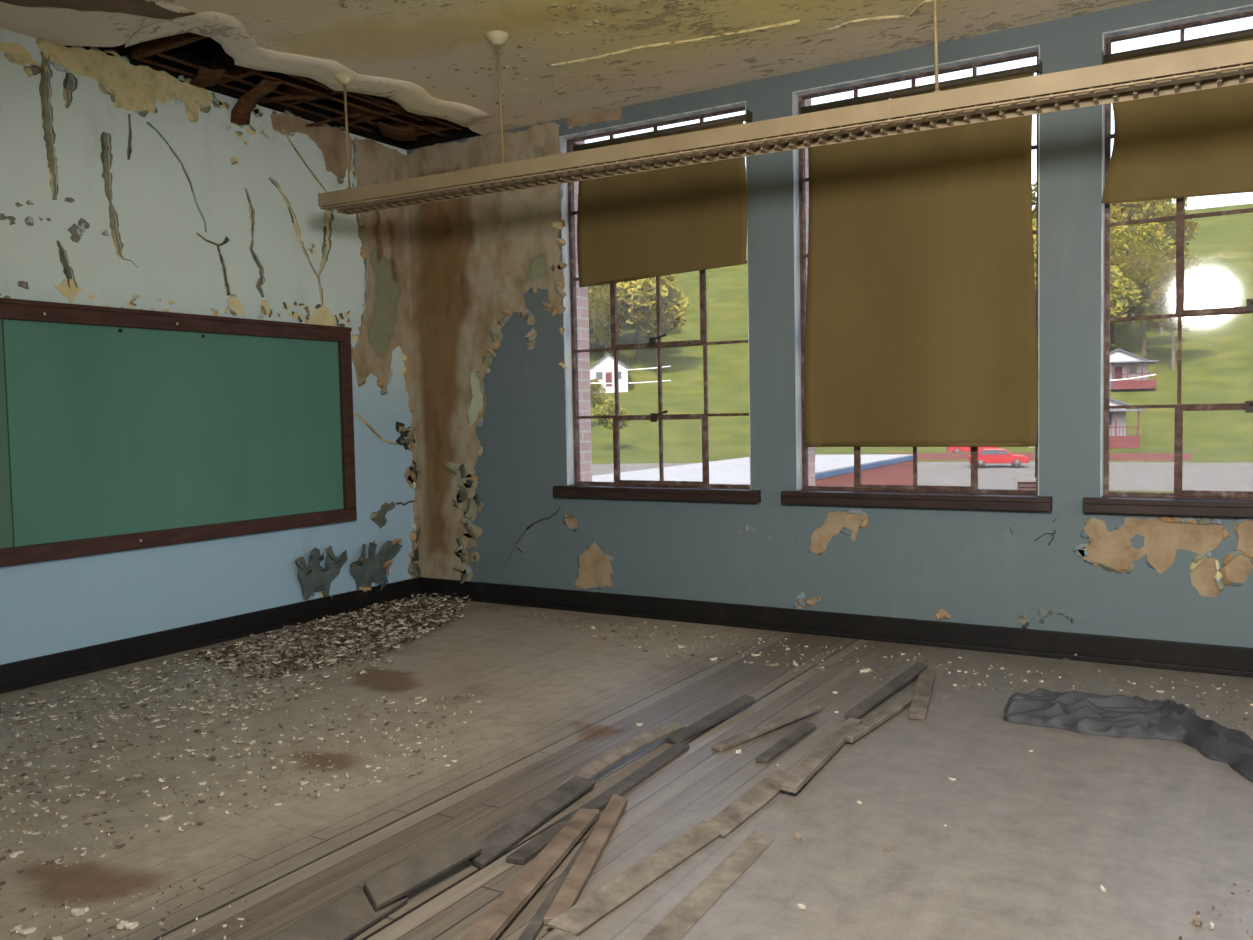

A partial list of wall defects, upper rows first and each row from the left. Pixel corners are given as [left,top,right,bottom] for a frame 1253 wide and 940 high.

peeling [0,0,197,21]
spalling [0,39,229,123]
crack [39,52,78,200]
spalling [226,105,622,188]
peeling [0,200,51,226]
peeling [67,218,110,243]
crack [100,114,368,328]
crack [55,240,82,304]
peeling [89,294,175,312]
spalling [210,184,567,600]
spalling [808,509,868,555]
spalling [575,541,614,590]